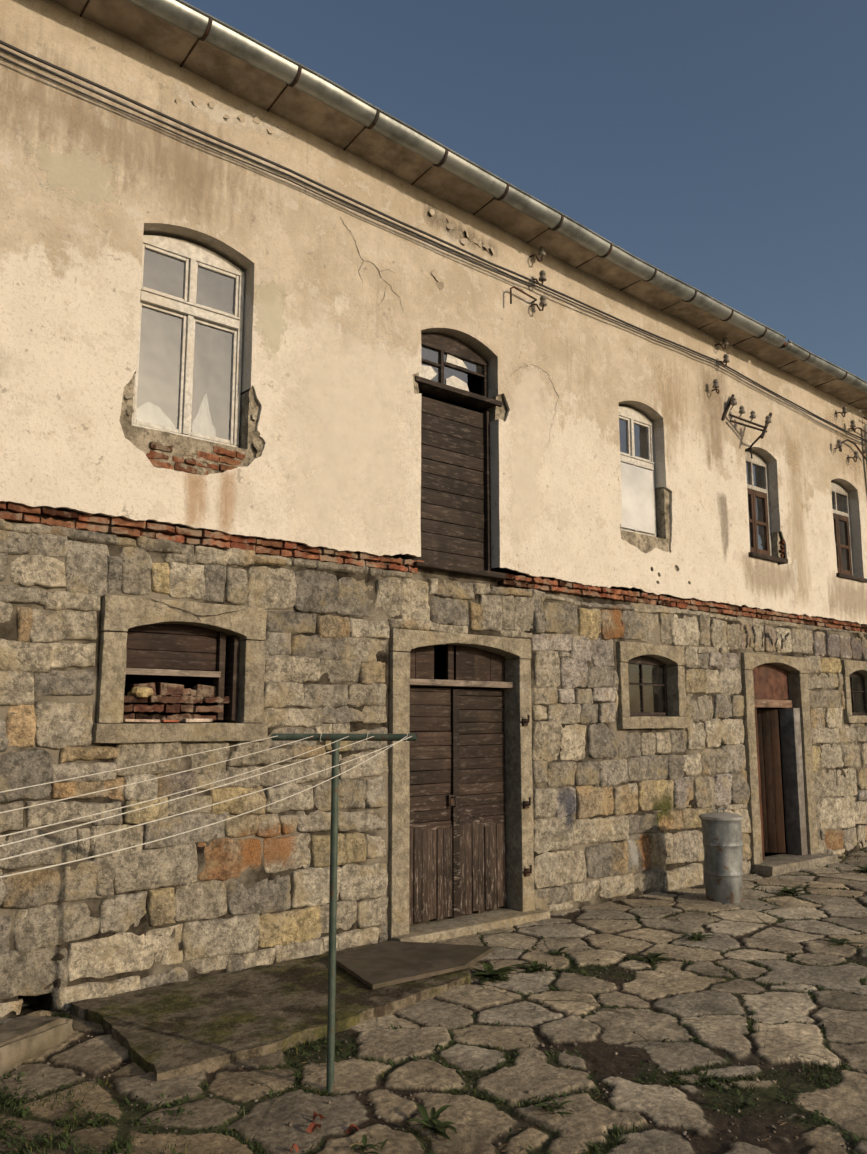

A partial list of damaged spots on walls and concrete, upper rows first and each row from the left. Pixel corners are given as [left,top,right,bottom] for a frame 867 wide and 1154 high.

crack [340,217,403,308]
peeling [428,208,495,255]
flaking render [119,375,264,475]
flaking render [620,487,670,553]